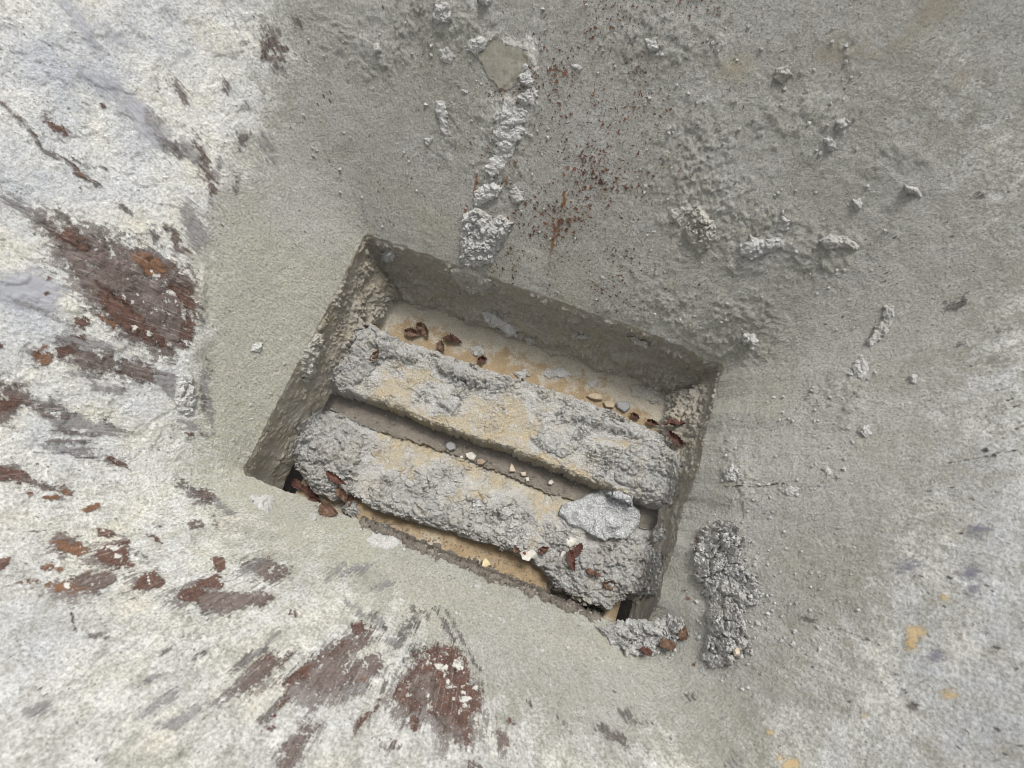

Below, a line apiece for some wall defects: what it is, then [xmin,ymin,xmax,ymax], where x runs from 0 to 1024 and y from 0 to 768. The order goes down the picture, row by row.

peeling [467,34,539,90]
rust [436,0,738,325]
rust [6,191,208,368]
spalling [446,441,486,465]
rust [15,527,281,619]
rust [185,513,224,543]
peeling [231,552,295,589]
peeling [521,549,538,561]
peeling [560,537,578,558]
rust [377,617,515,768]